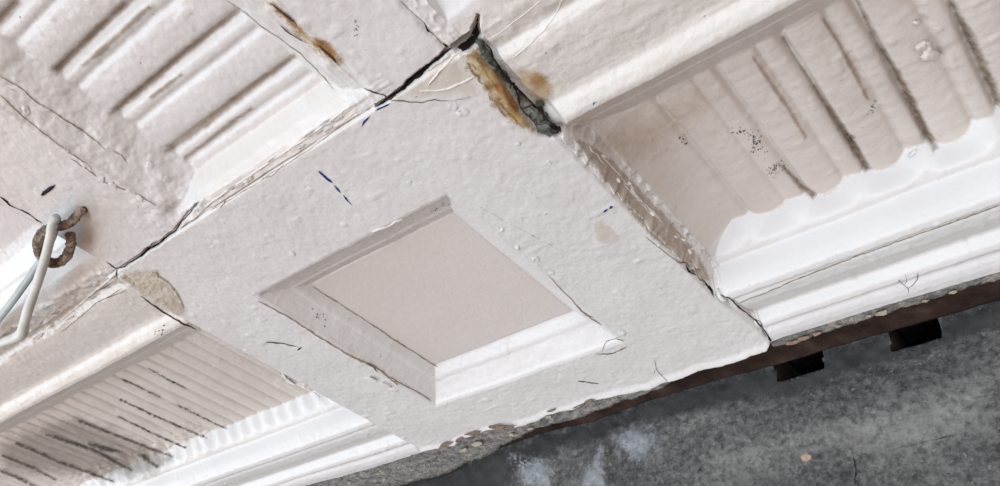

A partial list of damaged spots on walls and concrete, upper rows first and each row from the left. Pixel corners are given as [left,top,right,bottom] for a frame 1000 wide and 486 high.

crack [1,77,156,206]
crack [108,0,472,277]
corrosion [270,3,339,63]
corrosion [465,49,535,131]
spalling [33,262,184,340]
peeling [576,141,709,280]
crack [646,205,1000,342]